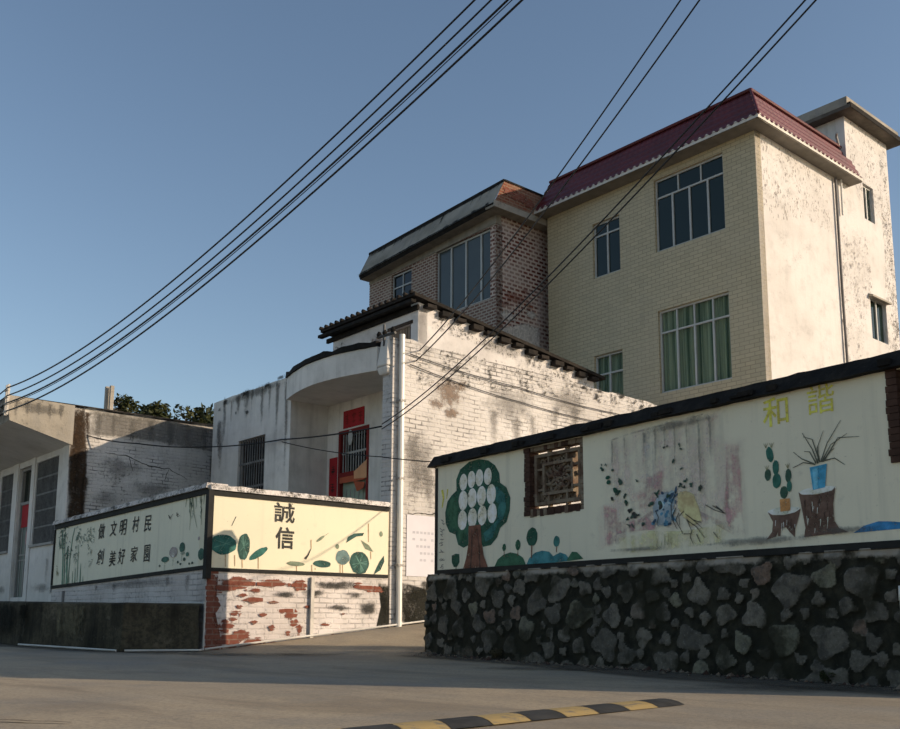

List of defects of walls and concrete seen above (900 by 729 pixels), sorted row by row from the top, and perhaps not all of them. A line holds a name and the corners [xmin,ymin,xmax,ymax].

damp [16,401,64,415]
damp [68,375,287,517]
peeling [204,571,310,650]
peeling [353,582,383,593]